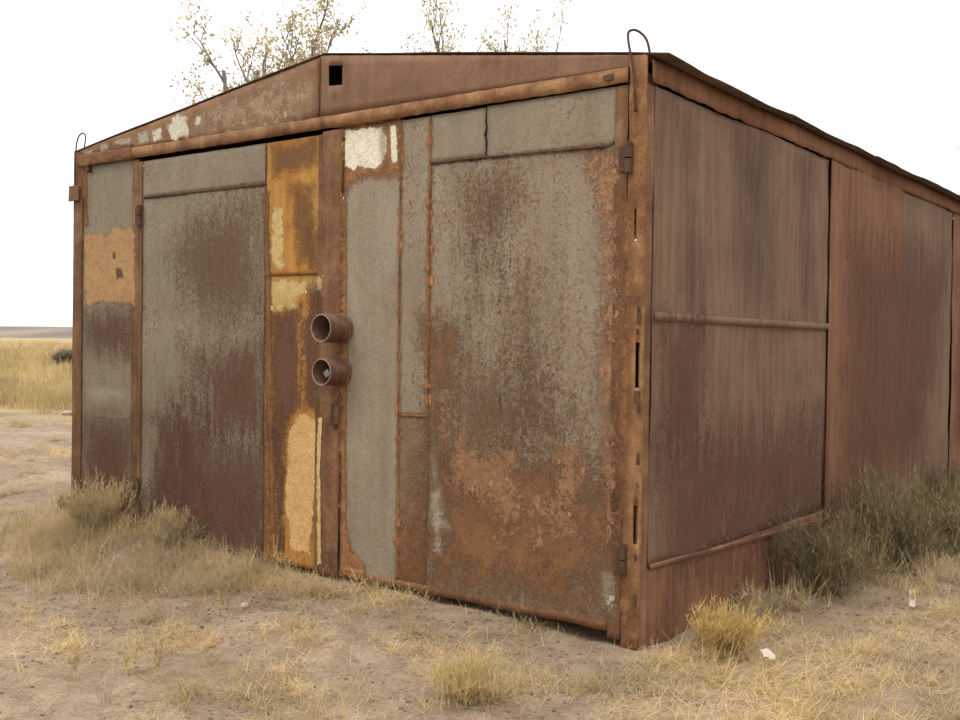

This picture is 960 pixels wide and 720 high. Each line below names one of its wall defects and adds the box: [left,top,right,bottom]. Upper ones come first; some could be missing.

rust [269,138,316,178]
peeling [344,125,398,171]
rust [214,181,319,553]
rust [416,154,622,632]